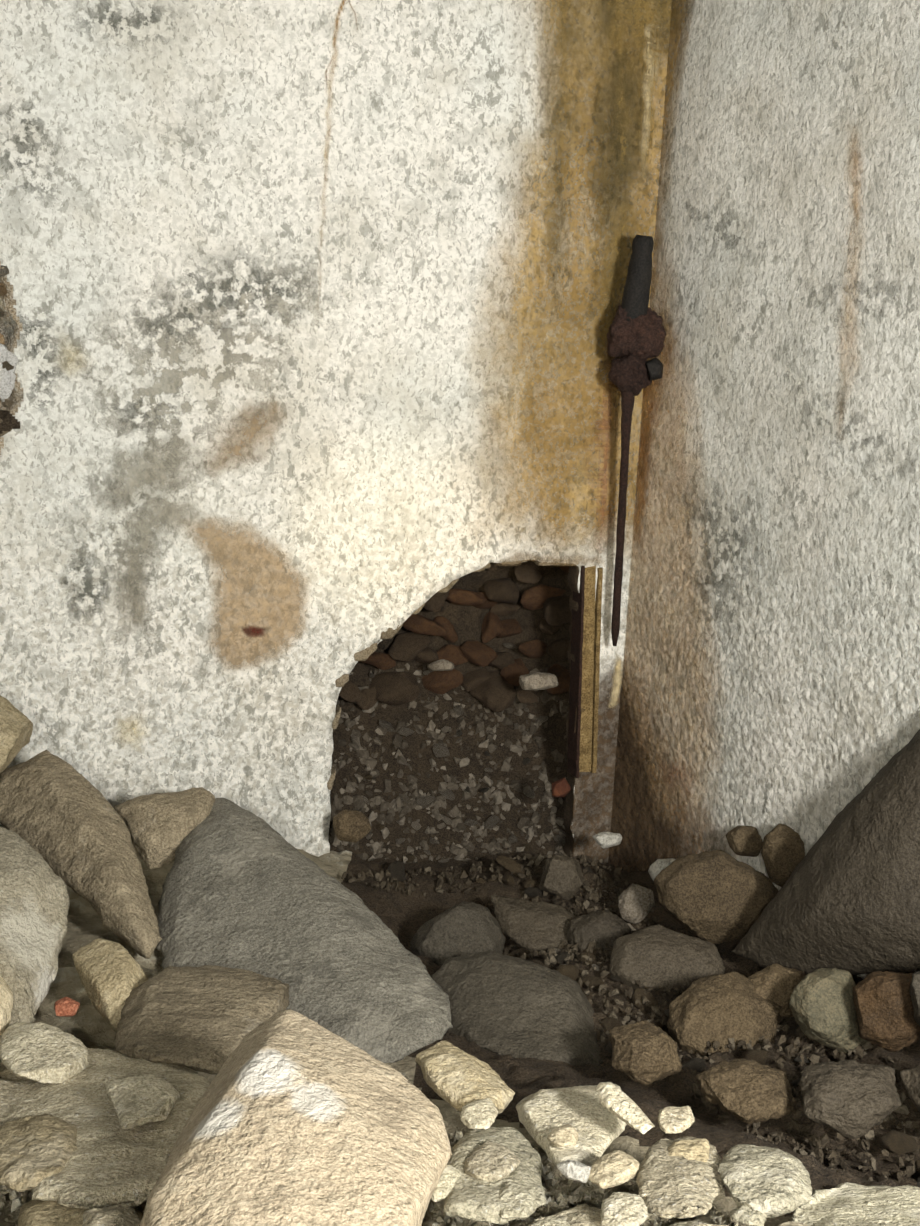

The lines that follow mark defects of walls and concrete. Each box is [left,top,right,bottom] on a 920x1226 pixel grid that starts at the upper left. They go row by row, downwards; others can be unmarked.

leakage [494,0,689,545]
spalling [0,261,24,457]
leakage [101,271,310,622]
leakage [65,552,105,611]
leakage [196,522,303,666]
spalling [354,624,403,661]
spalling [335,674,349,687]
spalling [332,704,341,729]
spalling [327,766,336,790]